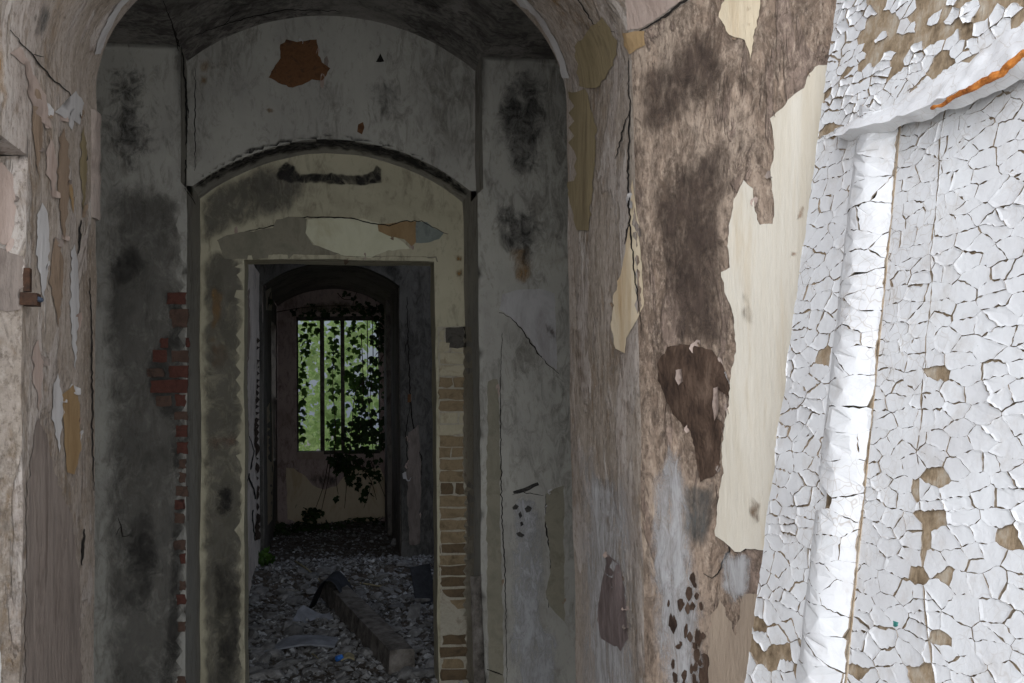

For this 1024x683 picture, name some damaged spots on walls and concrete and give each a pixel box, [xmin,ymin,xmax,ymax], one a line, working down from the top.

flaking render [269,38,330,88]
leakage [644,33,720,126]
peeling [718,0,760,57]
corrosion [930,49,1024,110]
peeling [218,217,444,265]
peeling [610,180,644,353]
leakage [658,148,720,340]
peeling [657,65,827,552]
flaking render [438,326,504,683]
peeling [597,552,631,651]
flaking render [667,572,757,683]
crack [703,546,756,578]